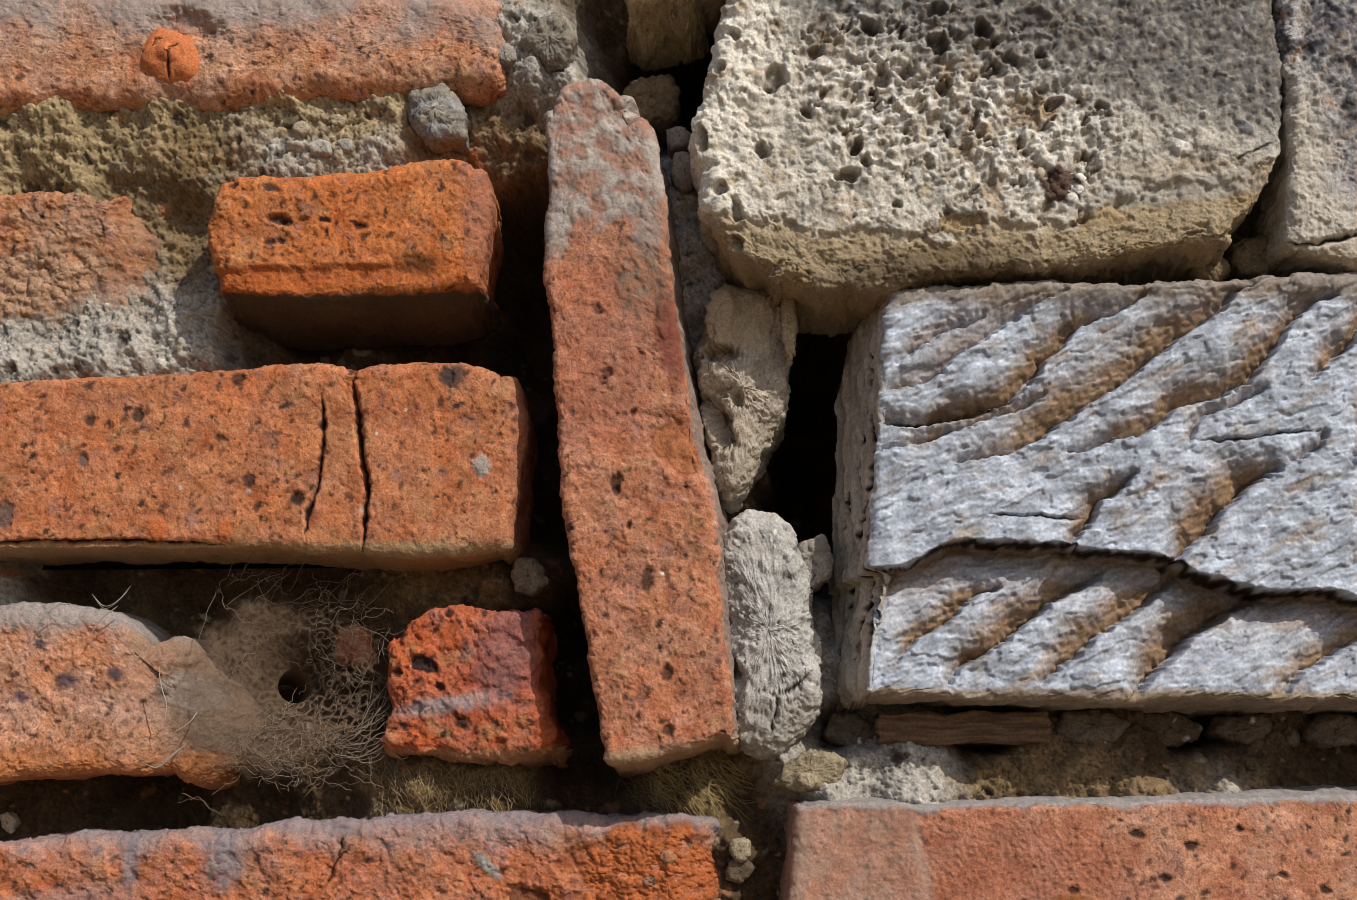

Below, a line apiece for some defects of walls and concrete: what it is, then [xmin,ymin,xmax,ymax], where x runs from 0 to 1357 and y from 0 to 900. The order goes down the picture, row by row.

crack [304,375,370,549]
crack [842,354,1357,660]